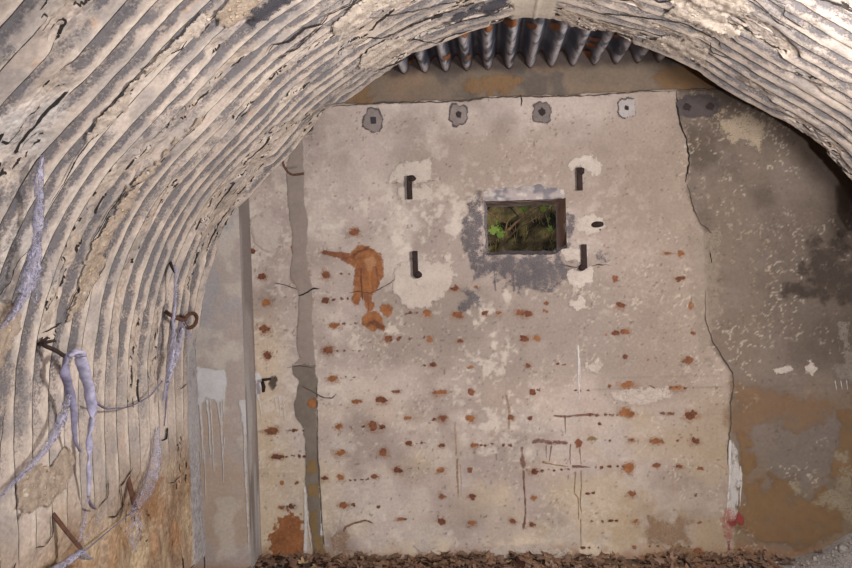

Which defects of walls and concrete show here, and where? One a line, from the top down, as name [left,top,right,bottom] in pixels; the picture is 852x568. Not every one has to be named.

spalling [332,0,410,35]
crack [587,0,731,59]
spalling [664,0,755,39]
crack [820,0,852,13]
leakage [713,102,780,154]
crack [45,112,208,332]
spalling [484,198,605,311]
corrosion [312,226,412,345]
corrosion [514,301,549,321]
leakage [680,226,852,557]
leakage [196,366,227,495]
corrosion [264,502,306,559]